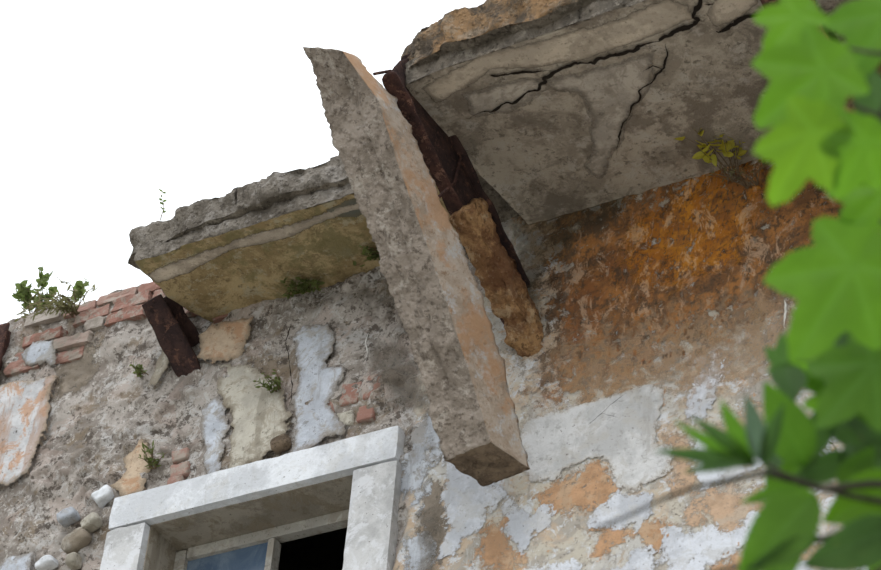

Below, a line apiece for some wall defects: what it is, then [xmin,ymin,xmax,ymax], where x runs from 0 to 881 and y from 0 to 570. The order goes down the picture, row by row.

crack [470,0,755,146]
corrosion [532,159,844,411]
spalling [50,341,101,403]
peeling [398,352,766,570]
peeling [797,544,819,570]